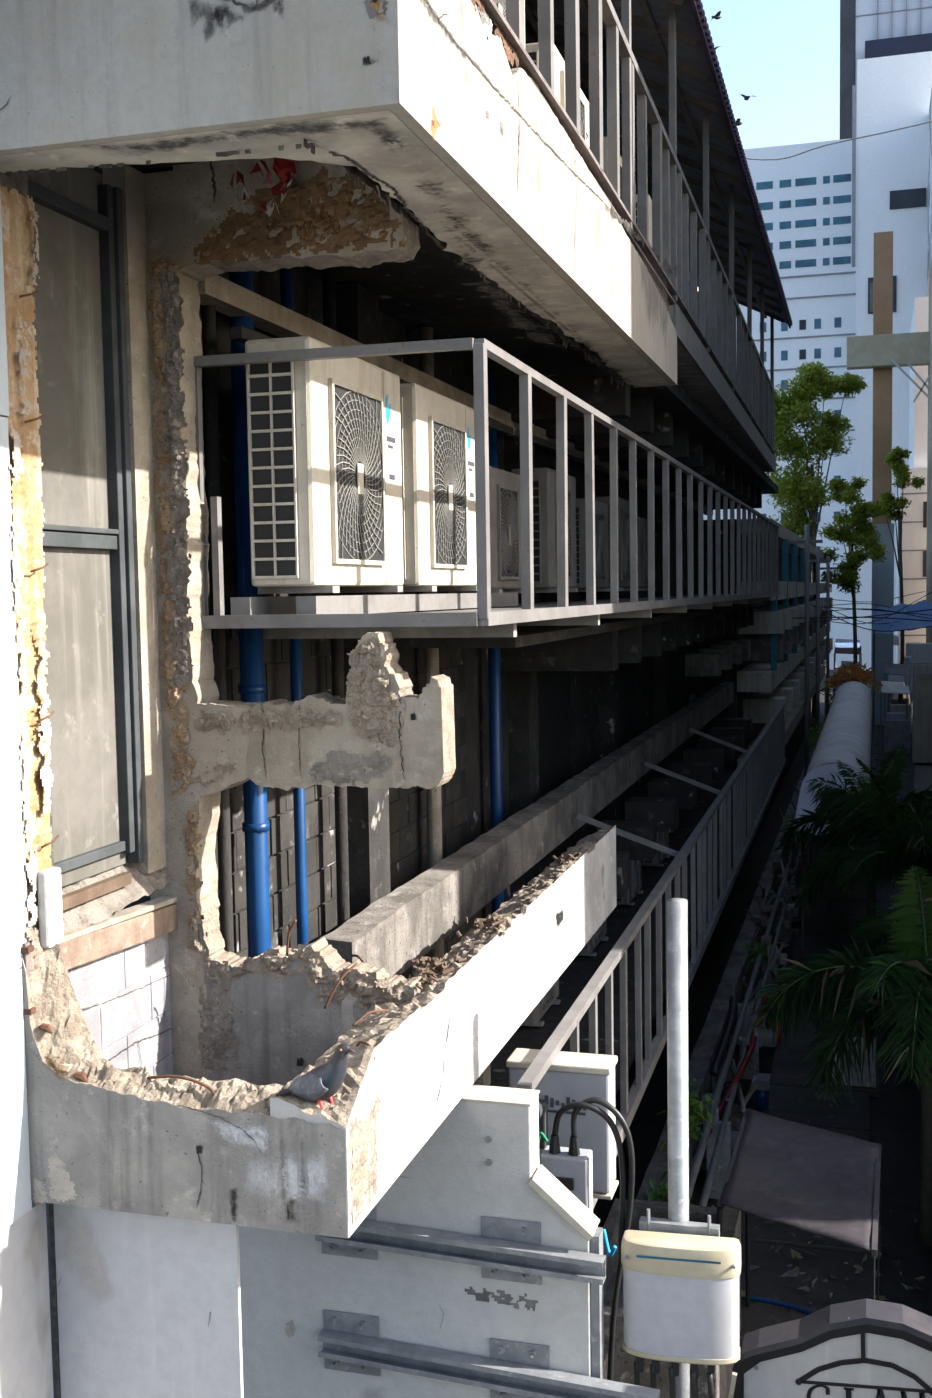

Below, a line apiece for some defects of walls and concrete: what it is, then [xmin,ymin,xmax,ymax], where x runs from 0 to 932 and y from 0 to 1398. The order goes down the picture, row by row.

crack [225,0,274,12]
crack [209,161,217,203]
spalling [215,149,251,157]
spalling [278,138,315,155]
crack [329,152,443,250]
spalling [342,165,464,265]
crack [414,0,677,311]
peeling [0,167,67,927]
peeling [146,252,237,953]
spalling [308,750,391,787]
spalling [147,977,243,1096]
peeling [319,954,389,1060]